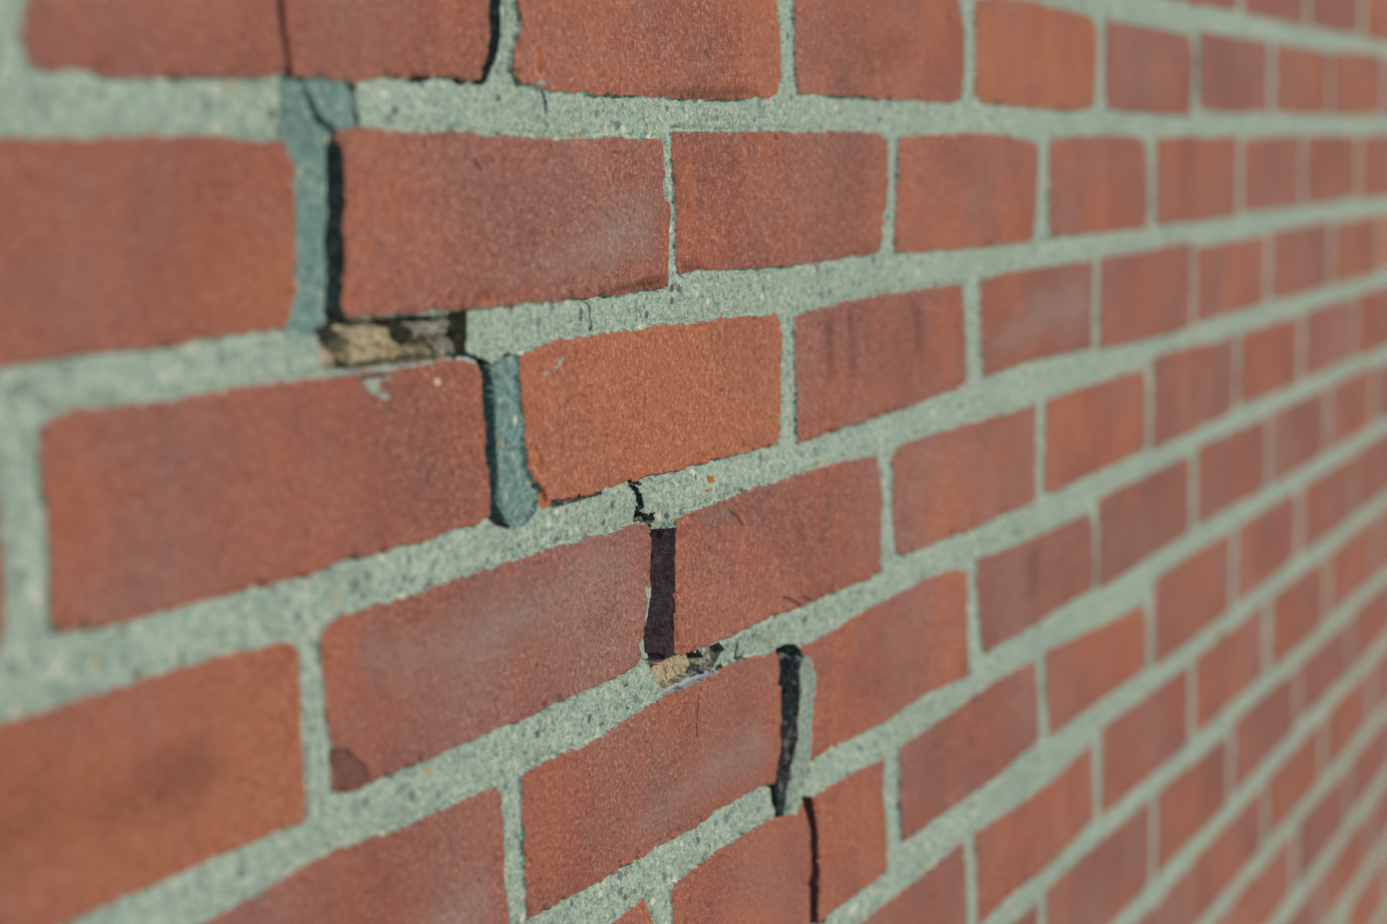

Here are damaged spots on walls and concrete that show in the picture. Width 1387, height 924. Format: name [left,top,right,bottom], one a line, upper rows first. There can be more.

crack [277,0,307,81]
crack [539,90,547,114]
crack [323,83,364,318]
spalling [312,292,493,400]
crack [456,353,511,365]
crack [582,299,592,332]
crack [550,478,803,738]
crack [782,595,812,608]
crack [771,795,826,924]